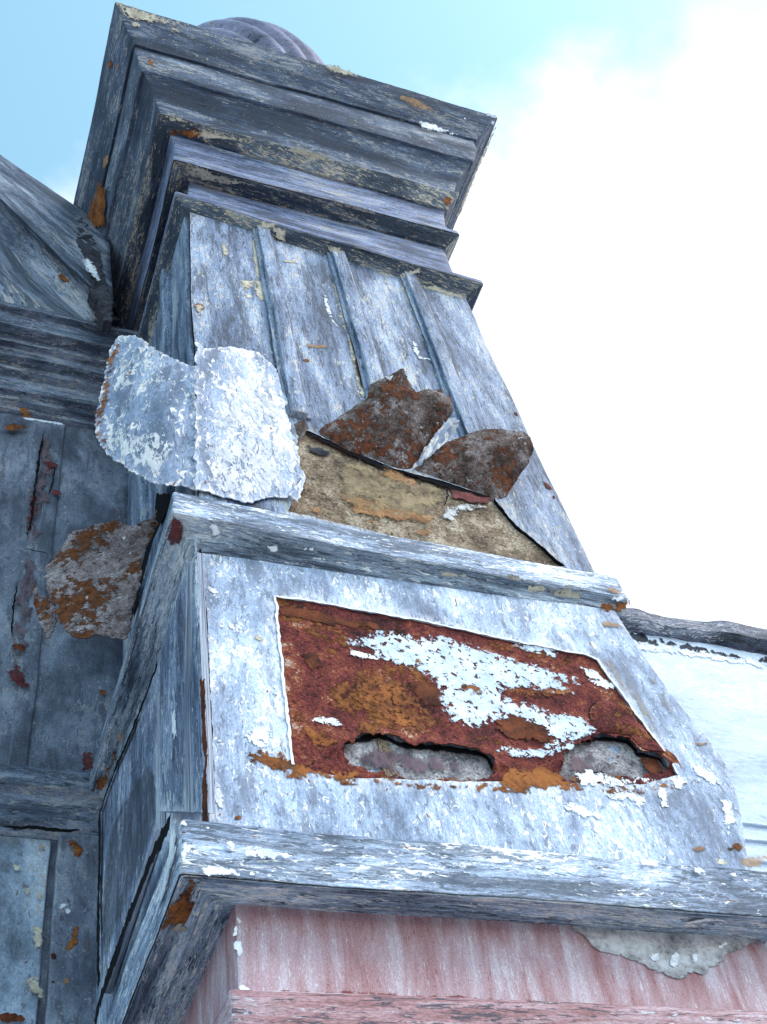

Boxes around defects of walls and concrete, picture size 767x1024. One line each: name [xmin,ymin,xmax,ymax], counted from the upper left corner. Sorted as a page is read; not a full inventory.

peeling [74,206,559,566]
crack [25,432,56,554]
crack [10,583,18,638]
rust [600,588,630,627]
rust [200,679,221,822]
peeling [312,716,342,726]
rust [350,667,447,733]
rust [245,749,704,794]
rust [496,714,548,743]
peeling [344,630,721,808]
crack [2,664,171,1024]
spalling [571,918,767,979]